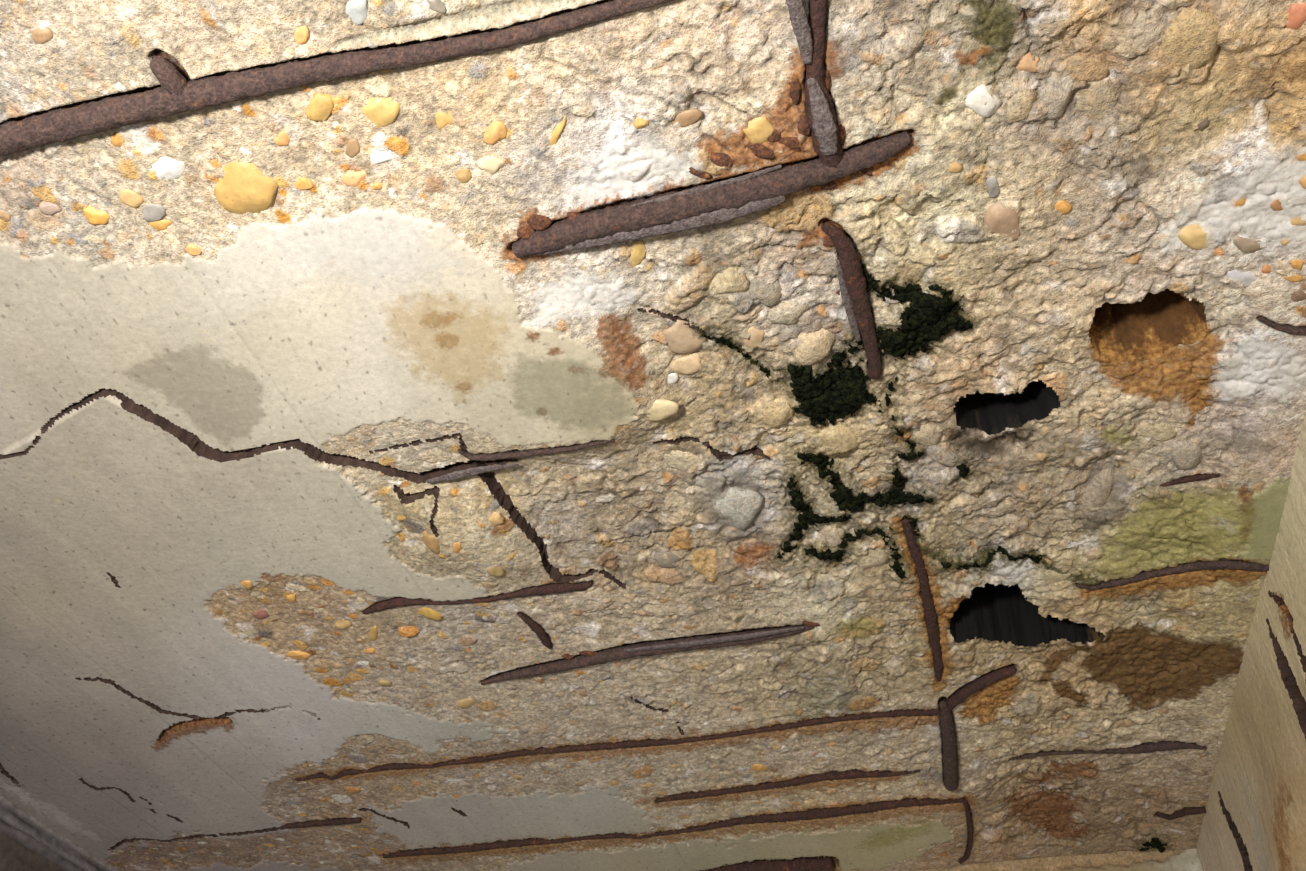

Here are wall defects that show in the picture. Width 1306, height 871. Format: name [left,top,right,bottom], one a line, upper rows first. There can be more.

spalling [0,0,613,130]
spalling [149,156,185,180]
rust [502,0,917,266]
spalling [794,328,836,367]
crack [0,388,627,589]
spalling [320,417,581,474]
damp [993,560,1034,582]
crack [75,677,321,741]
rust [291,515,966,785]
crack [1266,590,1306,739]
rust [379,768,978,865]
crack [1218,791,1253,871]